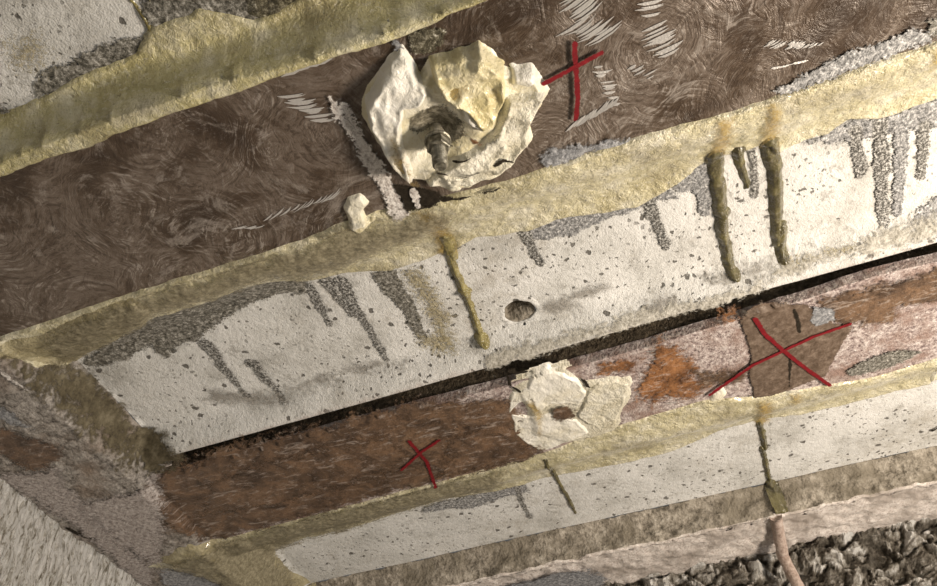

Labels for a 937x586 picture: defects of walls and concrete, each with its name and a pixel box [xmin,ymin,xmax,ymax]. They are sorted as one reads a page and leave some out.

corrosion [597,336,750,408]
corrosion [553,406,577,422]